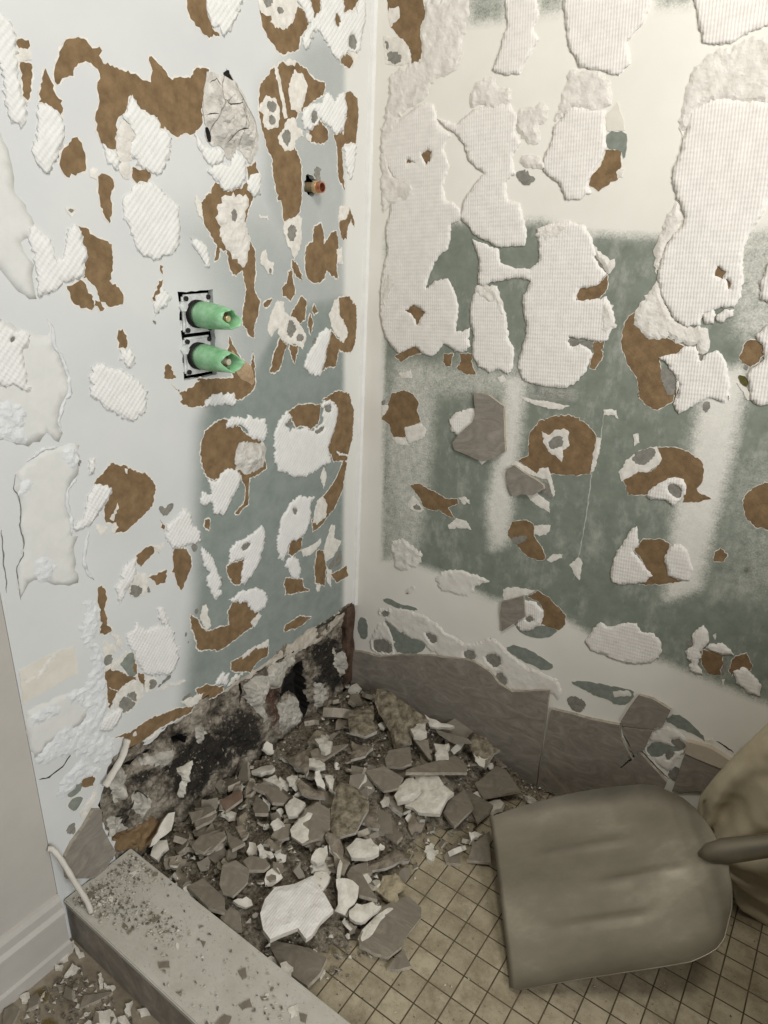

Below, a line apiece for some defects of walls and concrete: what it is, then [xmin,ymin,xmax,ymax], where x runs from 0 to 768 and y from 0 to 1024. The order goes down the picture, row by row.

peeling [383,0,426,66]
peeling [28,0,366,377]
peeling [381,346,426,445]
peeling [621,312,685,410]
peeling [73,336,269,748]
peeling [283,460,349,595]
peeling [508,397,618,580]
peeling [619,433,712,507]
leakage [266,668,292,723]
leakage [309,634,344,691]
peeling [500,587,566,670]
leakage [131,709,261,800]